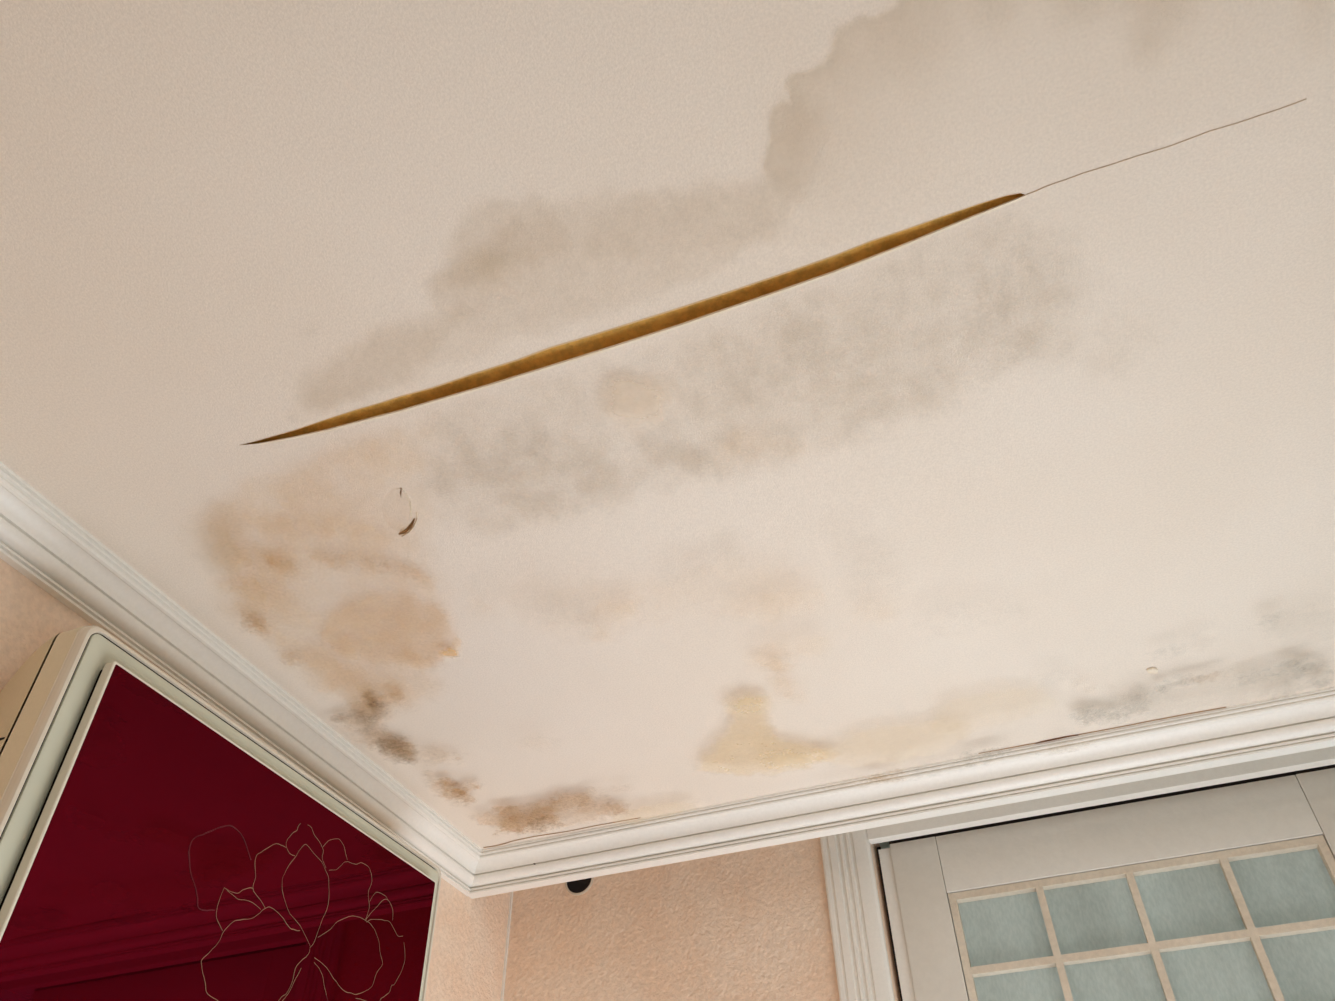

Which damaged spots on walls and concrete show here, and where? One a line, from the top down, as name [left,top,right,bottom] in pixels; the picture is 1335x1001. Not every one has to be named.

crack [1026,99,1306,195]